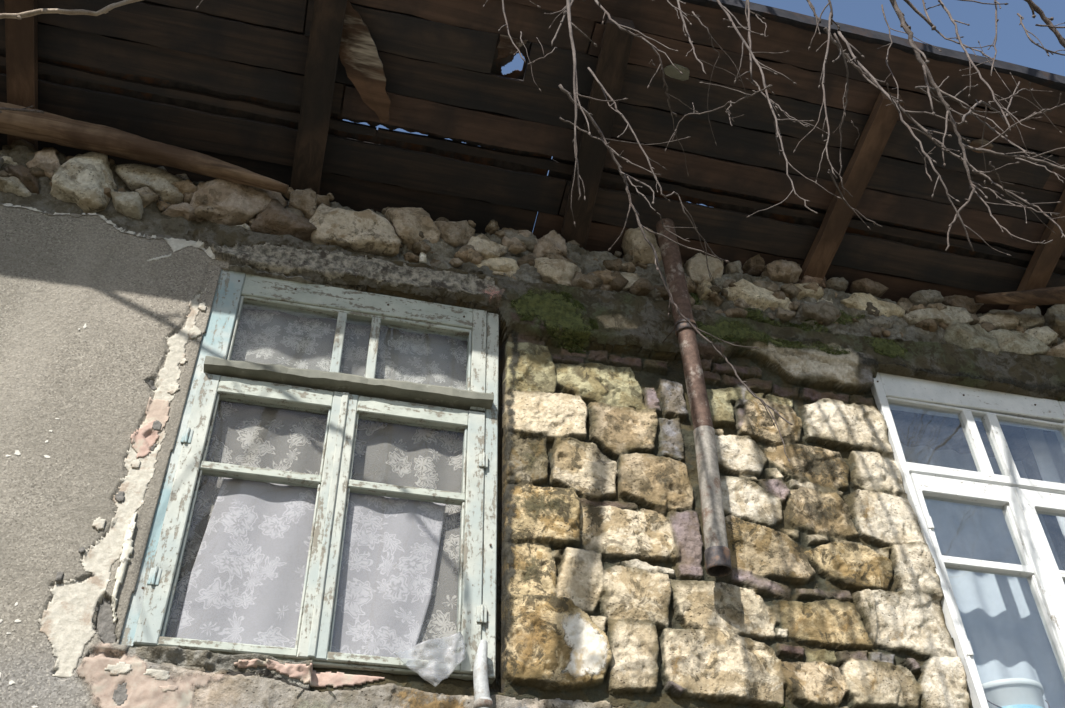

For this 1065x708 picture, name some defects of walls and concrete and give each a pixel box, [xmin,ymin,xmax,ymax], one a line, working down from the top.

peeling [38,284,385,708]